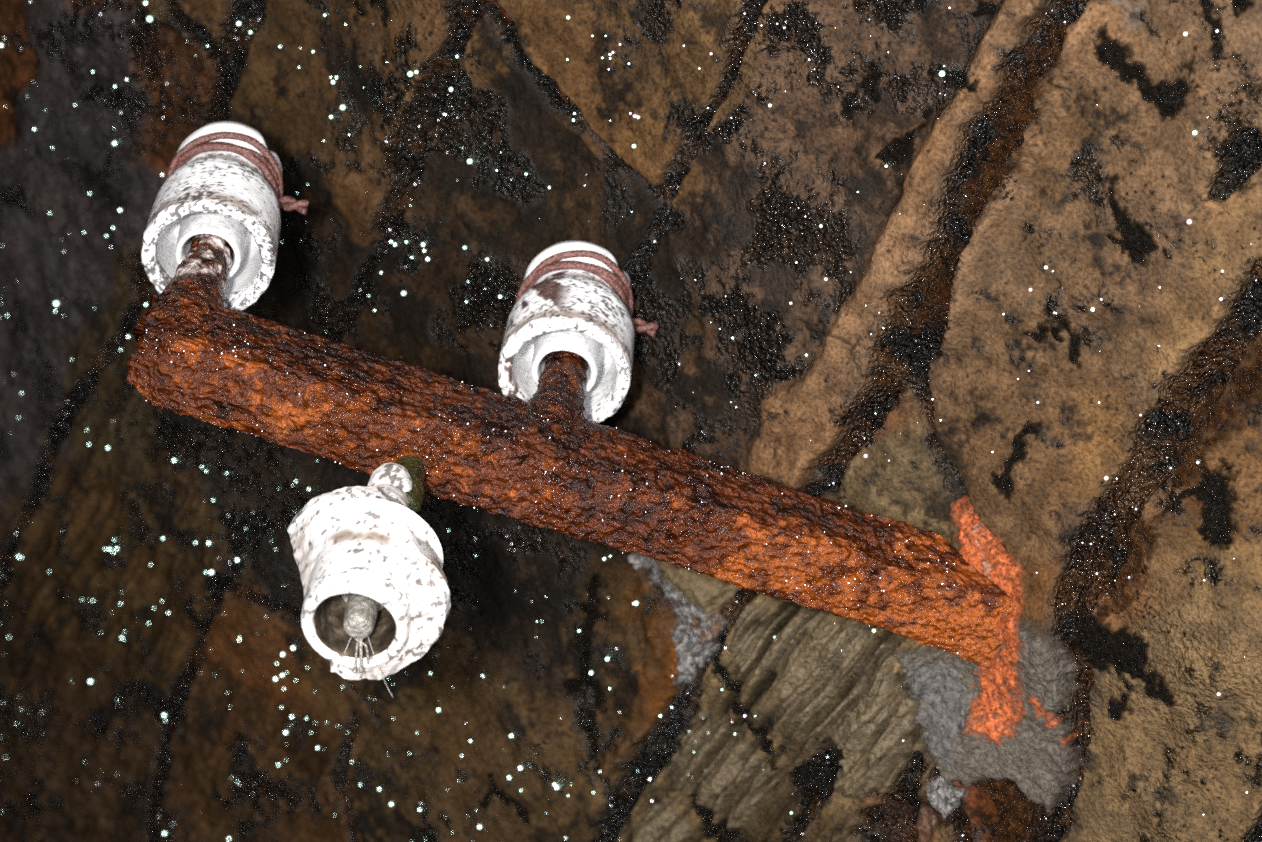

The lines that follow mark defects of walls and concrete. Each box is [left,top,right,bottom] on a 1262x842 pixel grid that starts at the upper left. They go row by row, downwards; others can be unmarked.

damp [1095,28,1193,119]
damp [875,101,939,166]
corrosion [962,22,1068,227]
damp [1102,174,1158,265]
corrosion [914,248,962,333]
damp [1024,315,1080,367]
corrosion [223,611,265,664]
crack [563,574,608,712]
corrosion [952,501,1056,743]
crack [711,637,778,772]
crack [479,773,530,825]
damp [916,777,966,837]